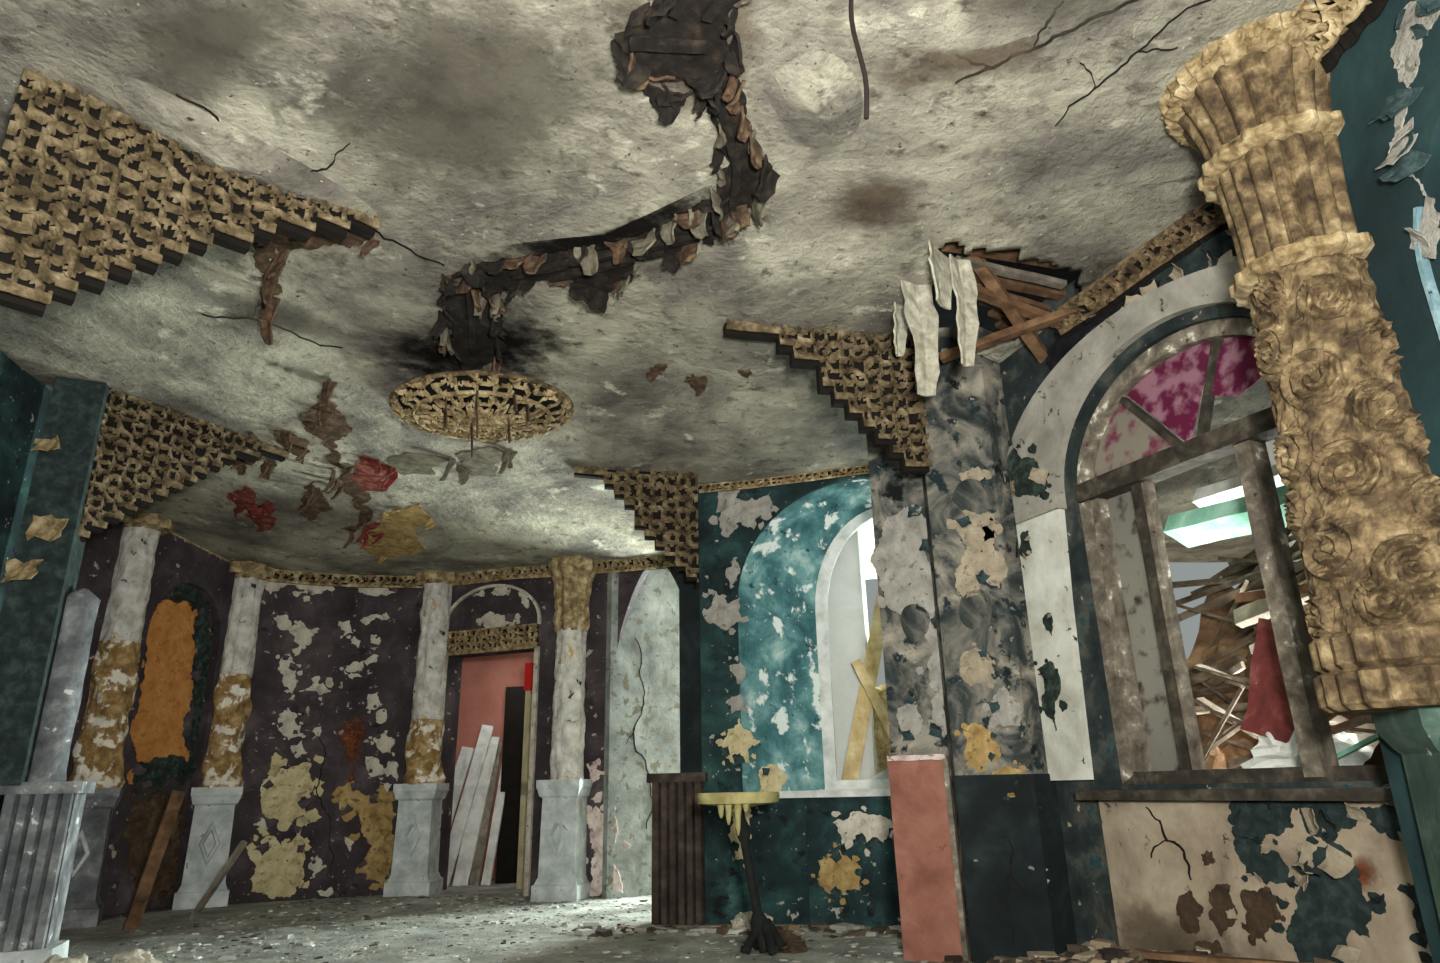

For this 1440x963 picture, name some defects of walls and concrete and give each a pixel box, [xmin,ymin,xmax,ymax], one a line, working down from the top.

crack [955,0,1212,127]
flaking render [429,0,780,372]
peeling [1368,0,1440,259]
peeling [708,489,779,537]
peeling [959,439,1052,500]
peeling [702,557,749,635]
flaking render [870,504,1068,801]
flaking render [246,581,399,899]
flaking render [716,663,788,792]
peeling [811,806,894,905]
crack [1145,807,1192,880]
peeling [1176,783,1433,963]